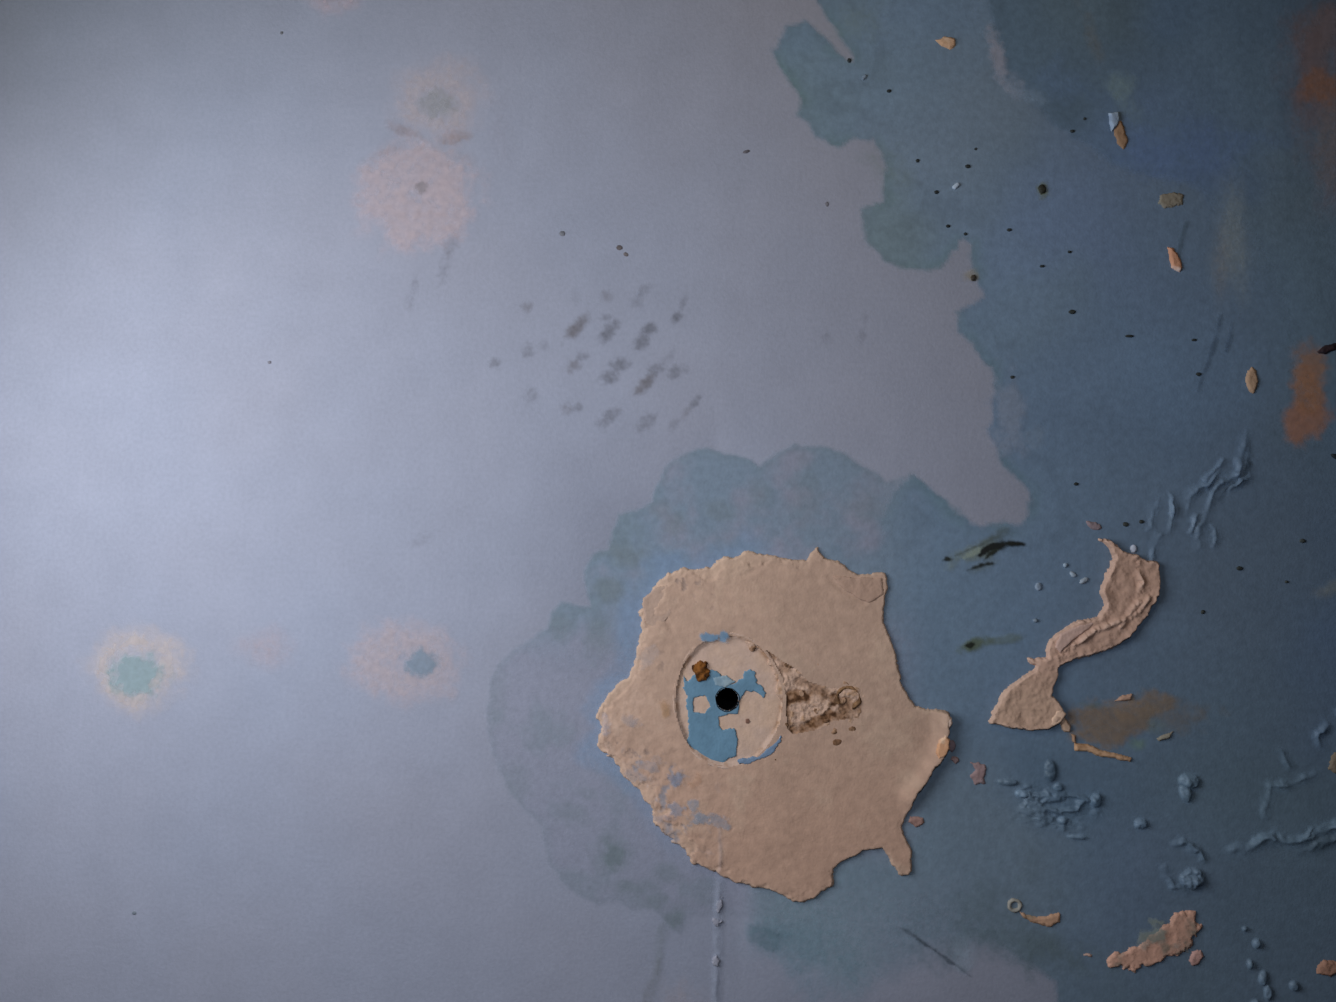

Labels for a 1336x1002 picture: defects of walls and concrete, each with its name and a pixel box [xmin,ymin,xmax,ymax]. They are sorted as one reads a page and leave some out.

rust [1286,353,1325,442]
water stain [493,0,1336,1002]
water stain [99,636,170,707]
spalling [963,637,1016,651]
peeling [988,521,1173,762]
peeling [596,547,987,902]
peeling [1083,910,1204,973]